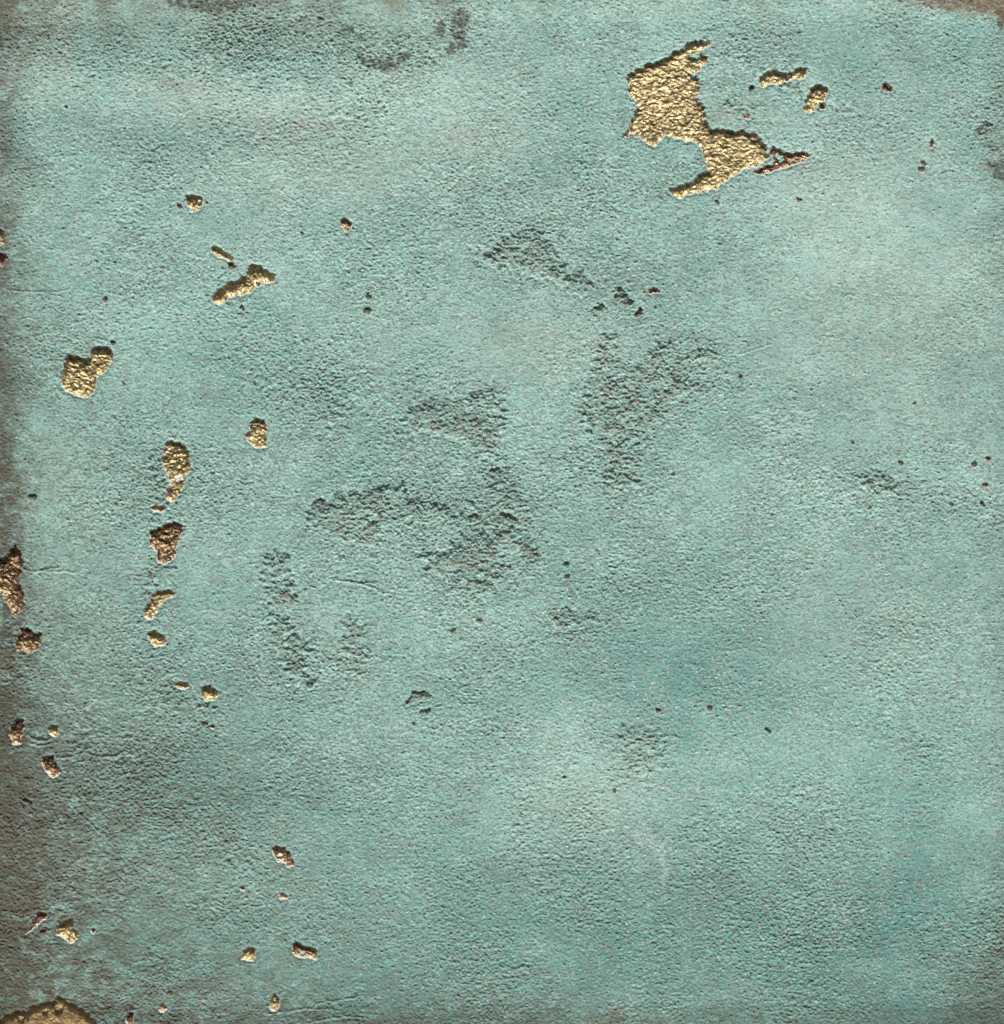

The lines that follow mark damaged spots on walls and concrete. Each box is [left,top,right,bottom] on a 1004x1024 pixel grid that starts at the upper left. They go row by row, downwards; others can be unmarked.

spalling [749,67,829,113]
spalling [622,40,812,206]
spalling [211,246,276,311]
spalling [61,341,116,399]
spalling [148,440,192,565]
spalling [0,544,42,654]
spalling [0,995,98,1024]